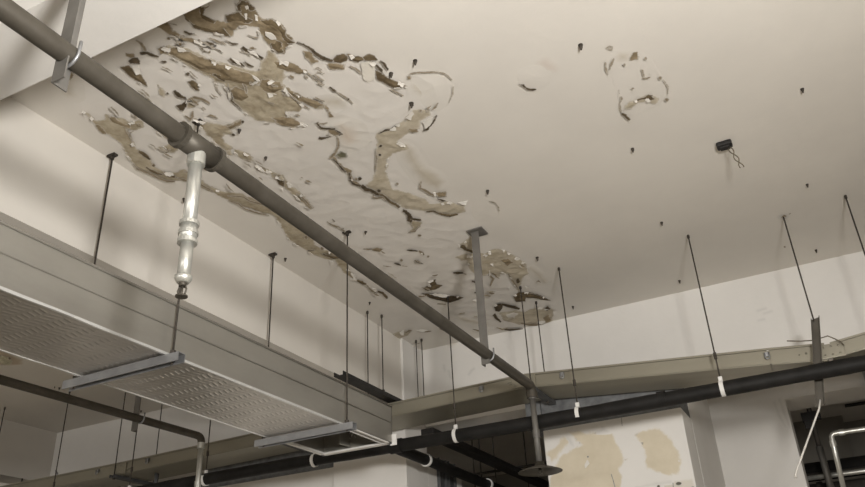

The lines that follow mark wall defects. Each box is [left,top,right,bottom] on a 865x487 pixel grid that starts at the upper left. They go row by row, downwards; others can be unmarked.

peeling [604,45,669,121]
peeling [30,71,188,198]
peeling [91,0,576,347]
peeling [540,388,683,414]
peeling [544,403,690,487]